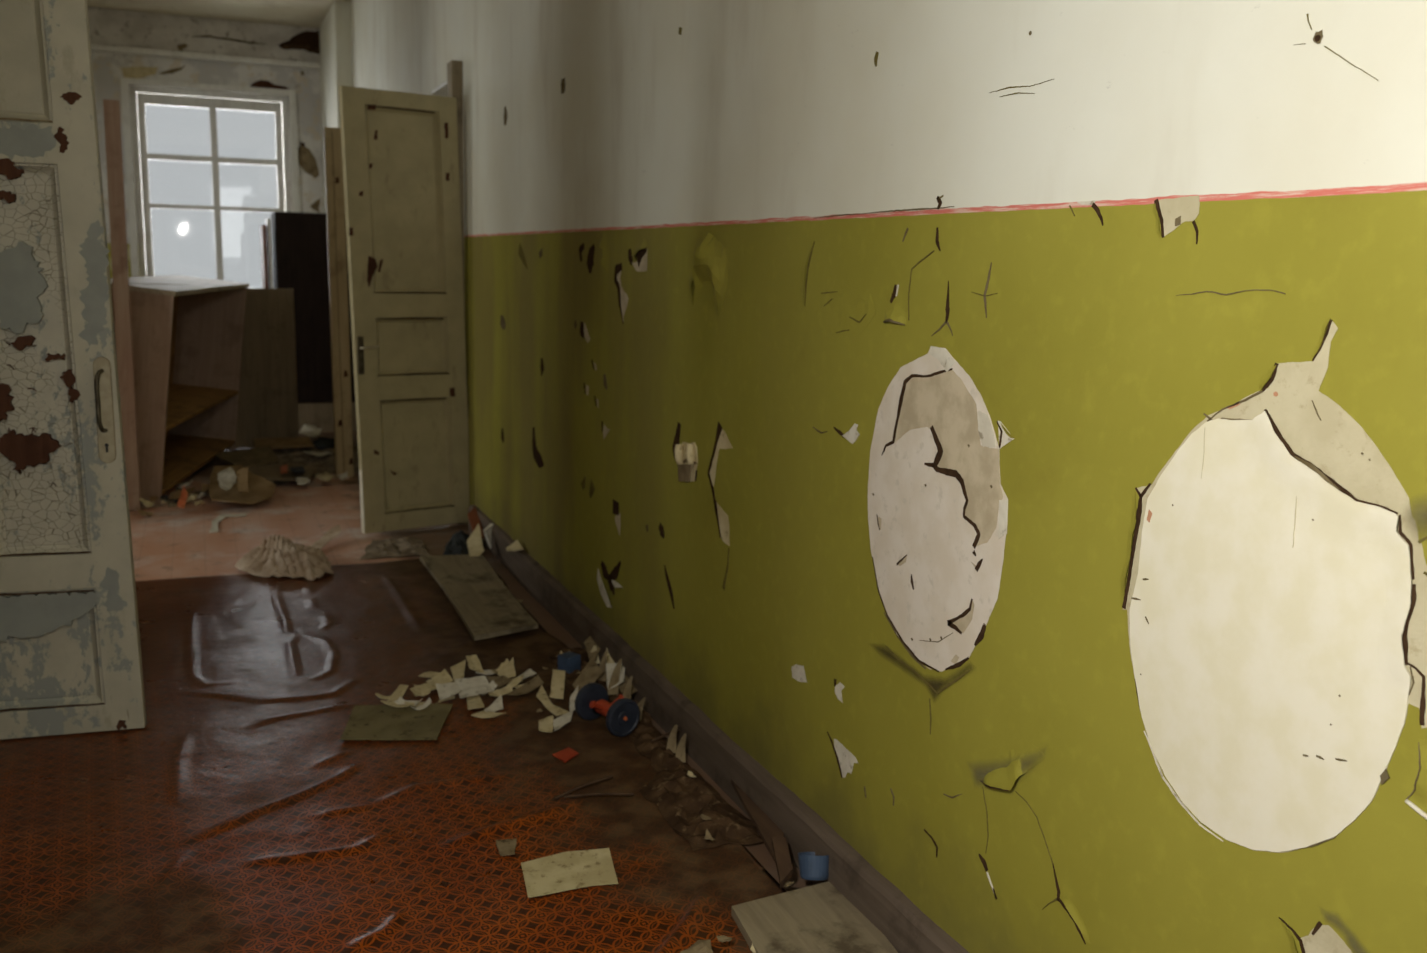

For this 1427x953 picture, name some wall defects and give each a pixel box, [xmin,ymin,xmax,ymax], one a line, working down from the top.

peeling [1152,196,1200,244]
peeling [672,421,733,591]
peeling [813,346,1008,672]
crack [995,421,1003,448]
peeling [1119,317,1427,853]
peeling [827,731,858,778]
crack [1015,791,1091,944]
peeling [1277,917,1352,953]